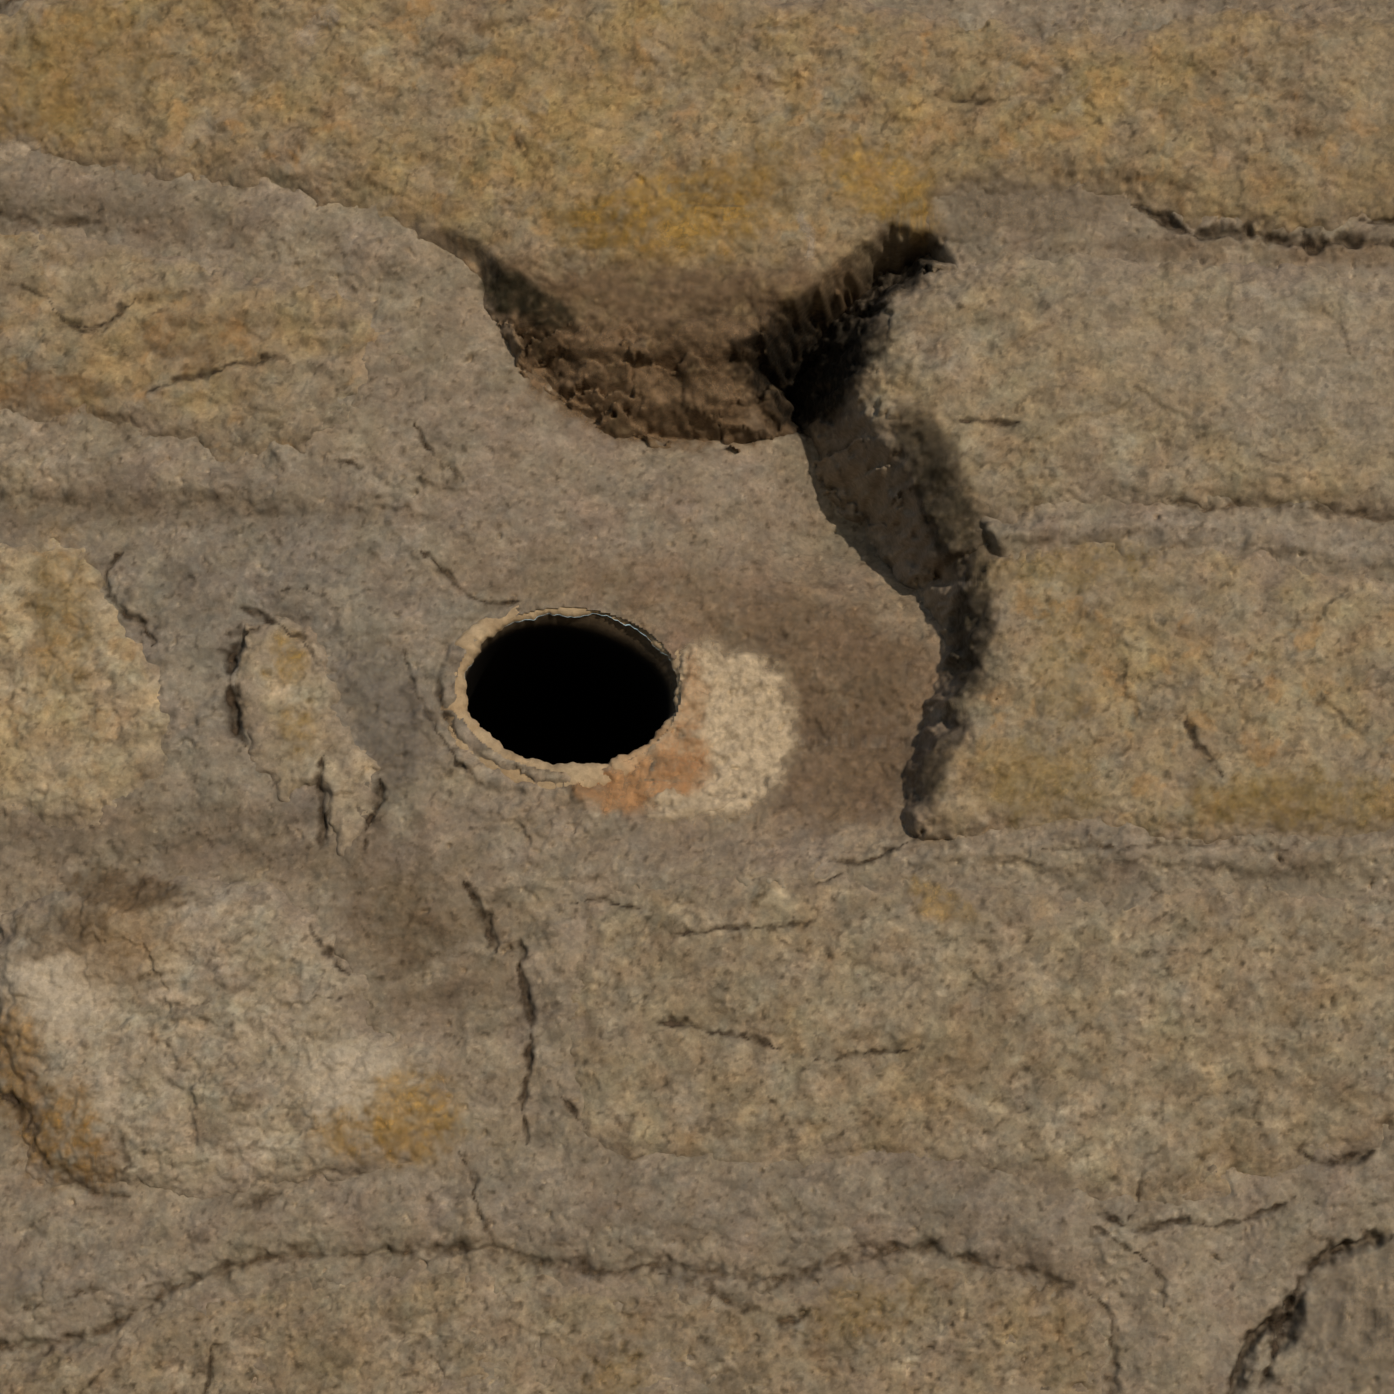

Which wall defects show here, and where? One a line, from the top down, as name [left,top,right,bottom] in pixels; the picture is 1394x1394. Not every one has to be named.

water stain [730,256,930,433]
water stain [946,565,994,694]
rust [590,727,703,810]
crack [463,881,533,1144]
crack [0,1091,36,1152]
crack [60,1166,129,1197]
crack [561,1097,577,1118]
crack [1229,1234,1391,1389]